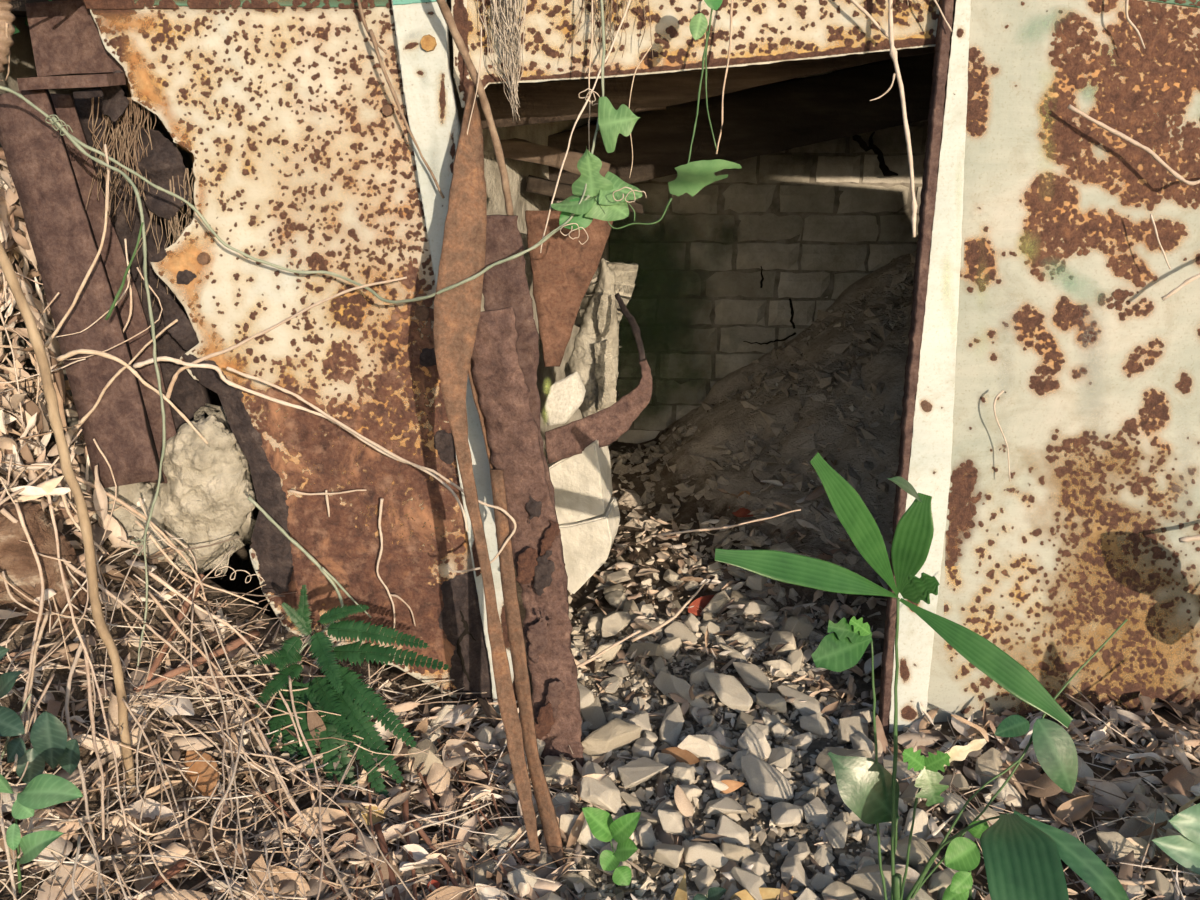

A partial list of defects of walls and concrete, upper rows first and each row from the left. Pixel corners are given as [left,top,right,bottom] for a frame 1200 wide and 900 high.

rust [83,0,940,868]
crack [743,298,796,345]
crack [853,132,898,176]
rust [954,0,1200,395]